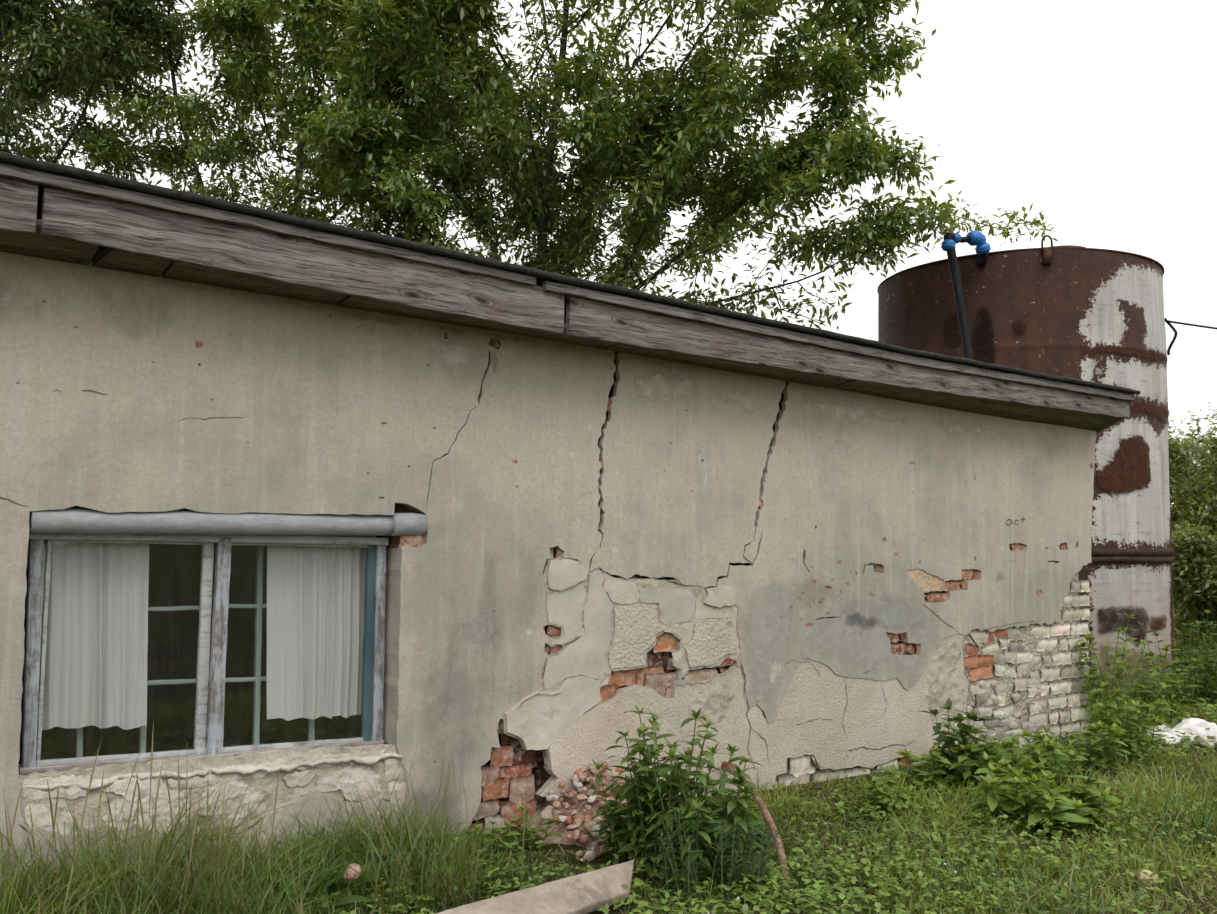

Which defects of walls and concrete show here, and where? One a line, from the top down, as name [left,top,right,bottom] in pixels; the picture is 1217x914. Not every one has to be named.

flaking render [543,547,563,575]
flaking render [543,625,562,655]
flaking render [467,720,551,832]